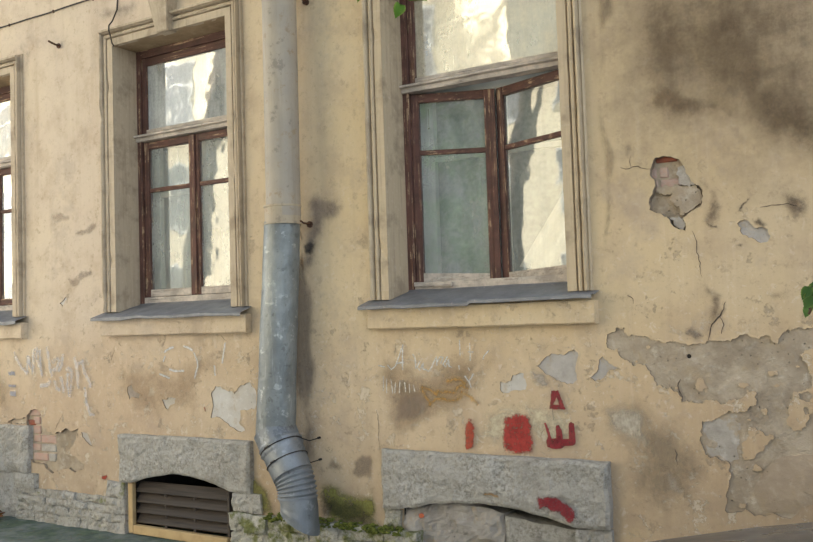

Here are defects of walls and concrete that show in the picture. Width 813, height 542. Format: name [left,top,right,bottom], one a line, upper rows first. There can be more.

flaking render [647,154,705,233]
flaking render [735,217,773,245]
crack [708,303,725,340]
flaking render [4,408,94,475]
flaking render [210,381,257,433]
flaking render [534,323,813,521]